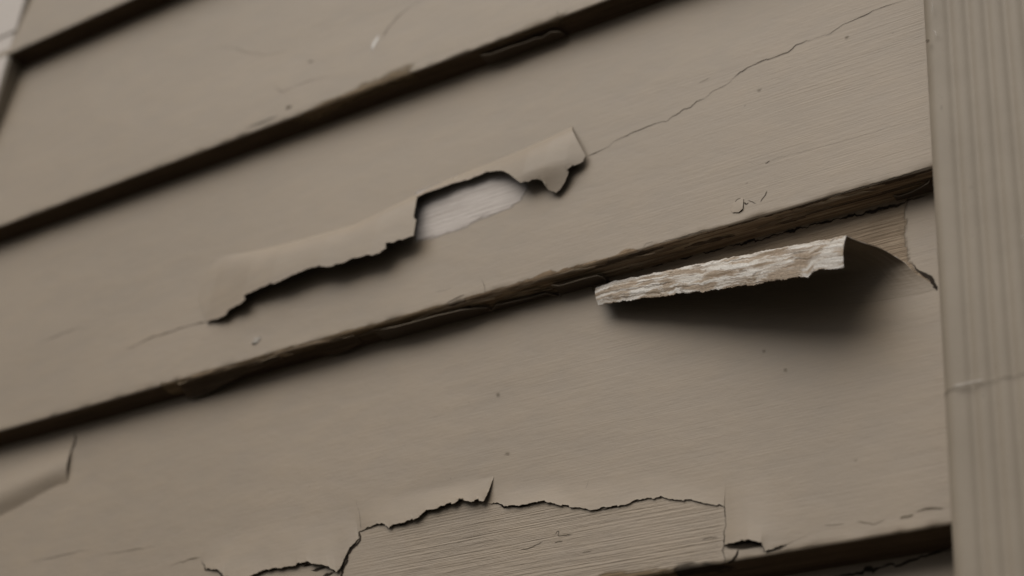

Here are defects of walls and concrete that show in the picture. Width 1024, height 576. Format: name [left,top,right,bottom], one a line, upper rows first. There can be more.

peeling [198,127,586,322]
peeling [376,180,938,342]
peeling [202,469,811,576]